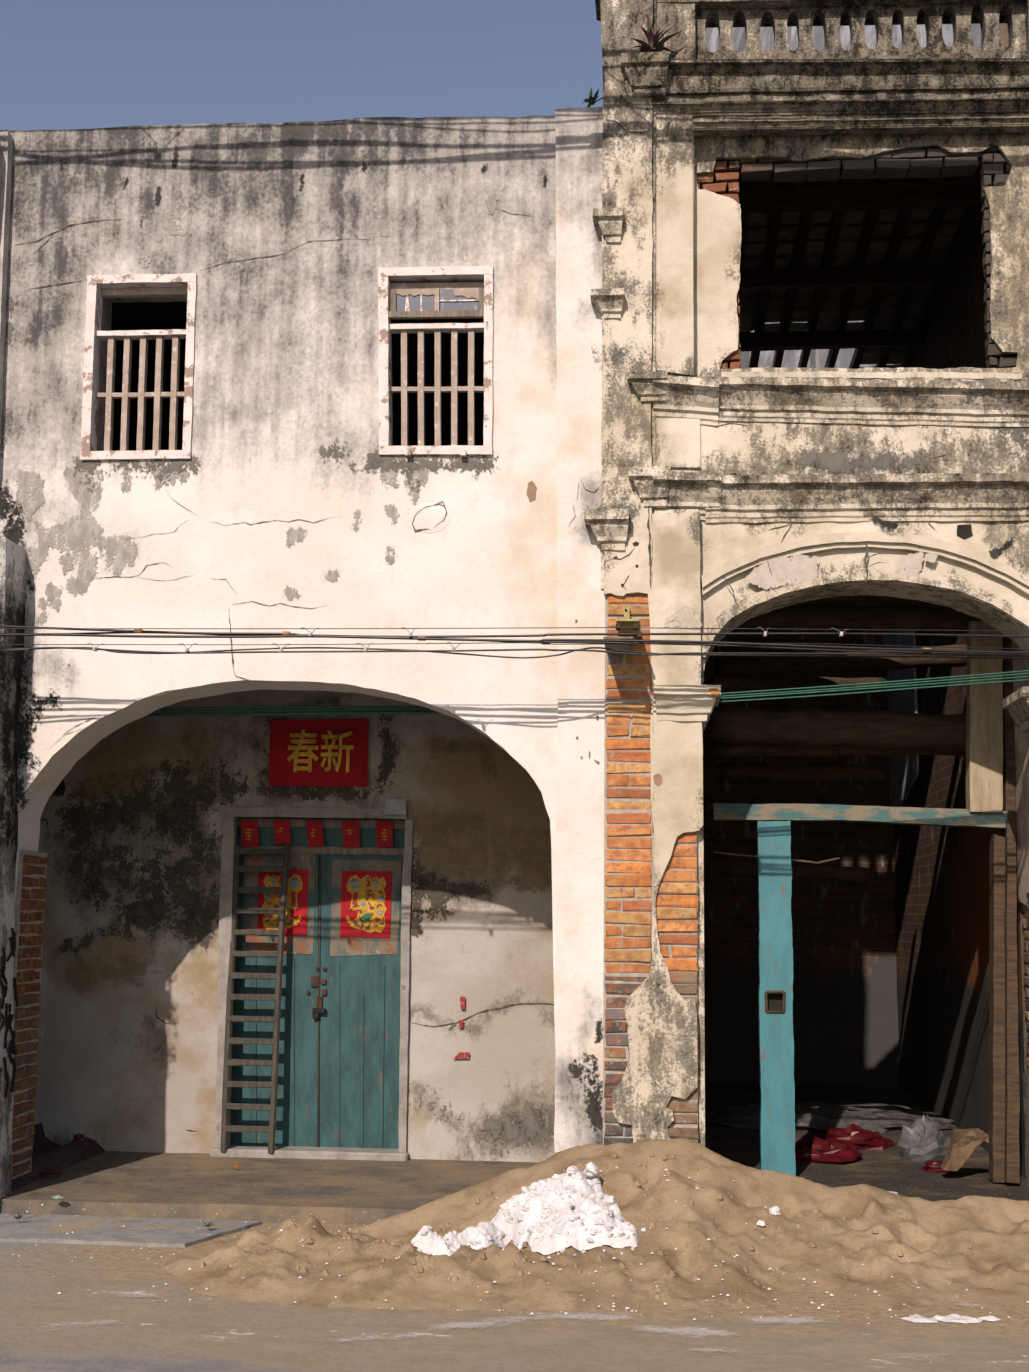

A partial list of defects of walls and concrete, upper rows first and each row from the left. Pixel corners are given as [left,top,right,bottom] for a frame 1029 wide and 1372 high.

damp [283,131,304,225]
damp [0,481,27,546]
damp [581,496,640,527]
crack [91,489,339,682]
peeling [746,554,819,590]
peeling [896,551,938,577]
damp [0,636,257,995]
damp [410,810,552,937]
flaking render [581,584,703,1145]
flaking render [11,850,105,1192]
crack [411,1002,554,1030]
damp [475,1098,555,1157]